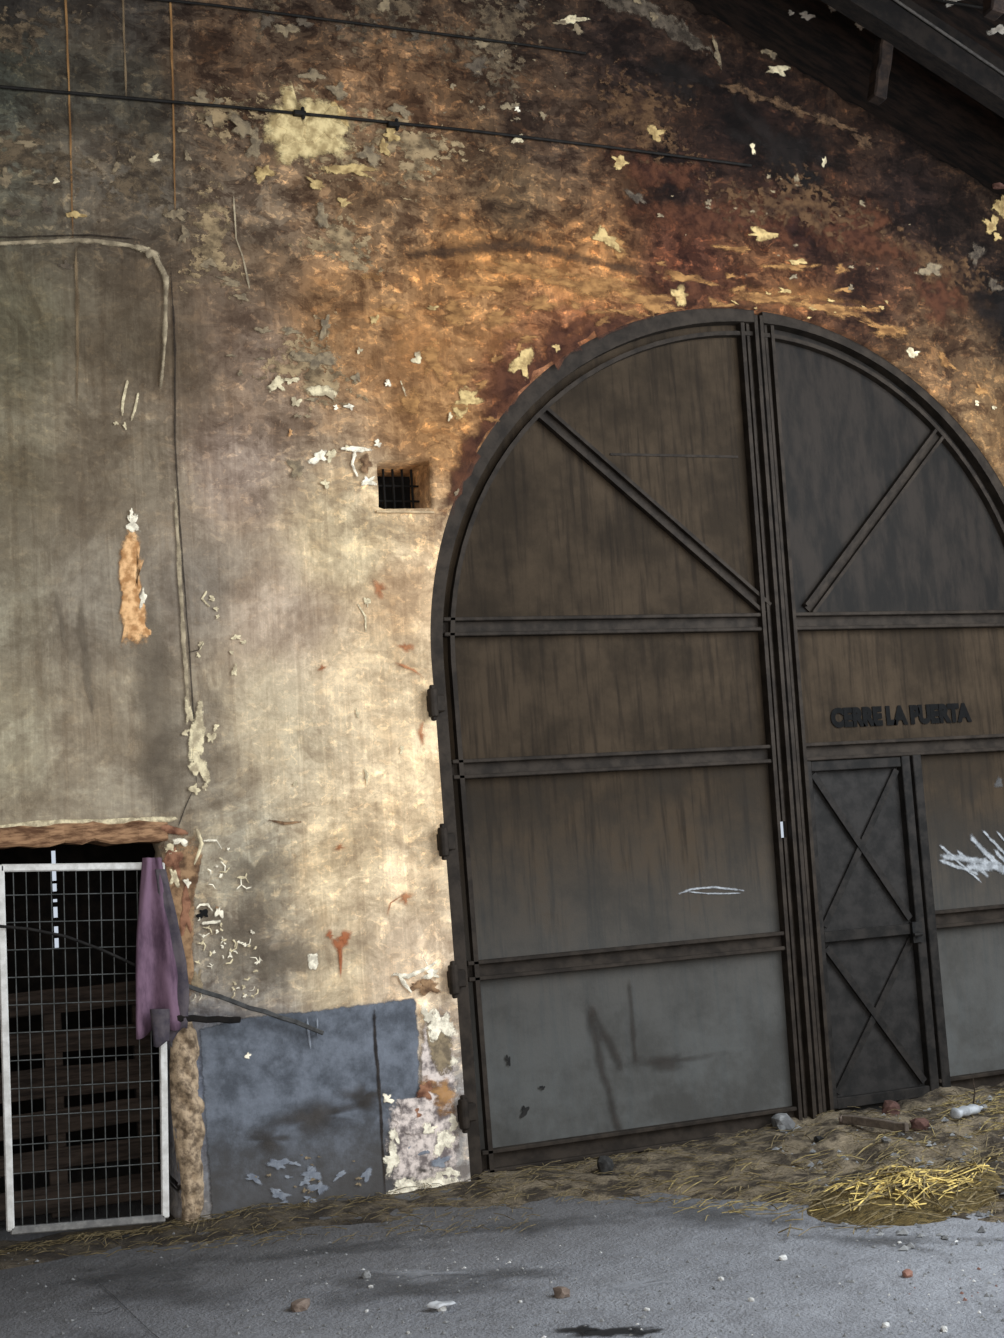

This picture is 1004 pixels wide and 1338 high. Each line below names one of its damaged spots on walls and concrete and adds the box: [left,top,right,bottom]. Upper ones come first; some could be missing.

rust [64,0,73,230]
peeling [177,68,484,324]
peeling [253,0,589,144]
peeling [427,55,1004,358]
spalling [761,49,790,76]
leakage [725,95,843,202]
peeling [226,304,369,436]
peeling [492,335,539,378]
leakage [977,277,1004,352]
spalling [287,439,382,486]
spalling [119,508,151,643]
spalling [246,956,460,1203]